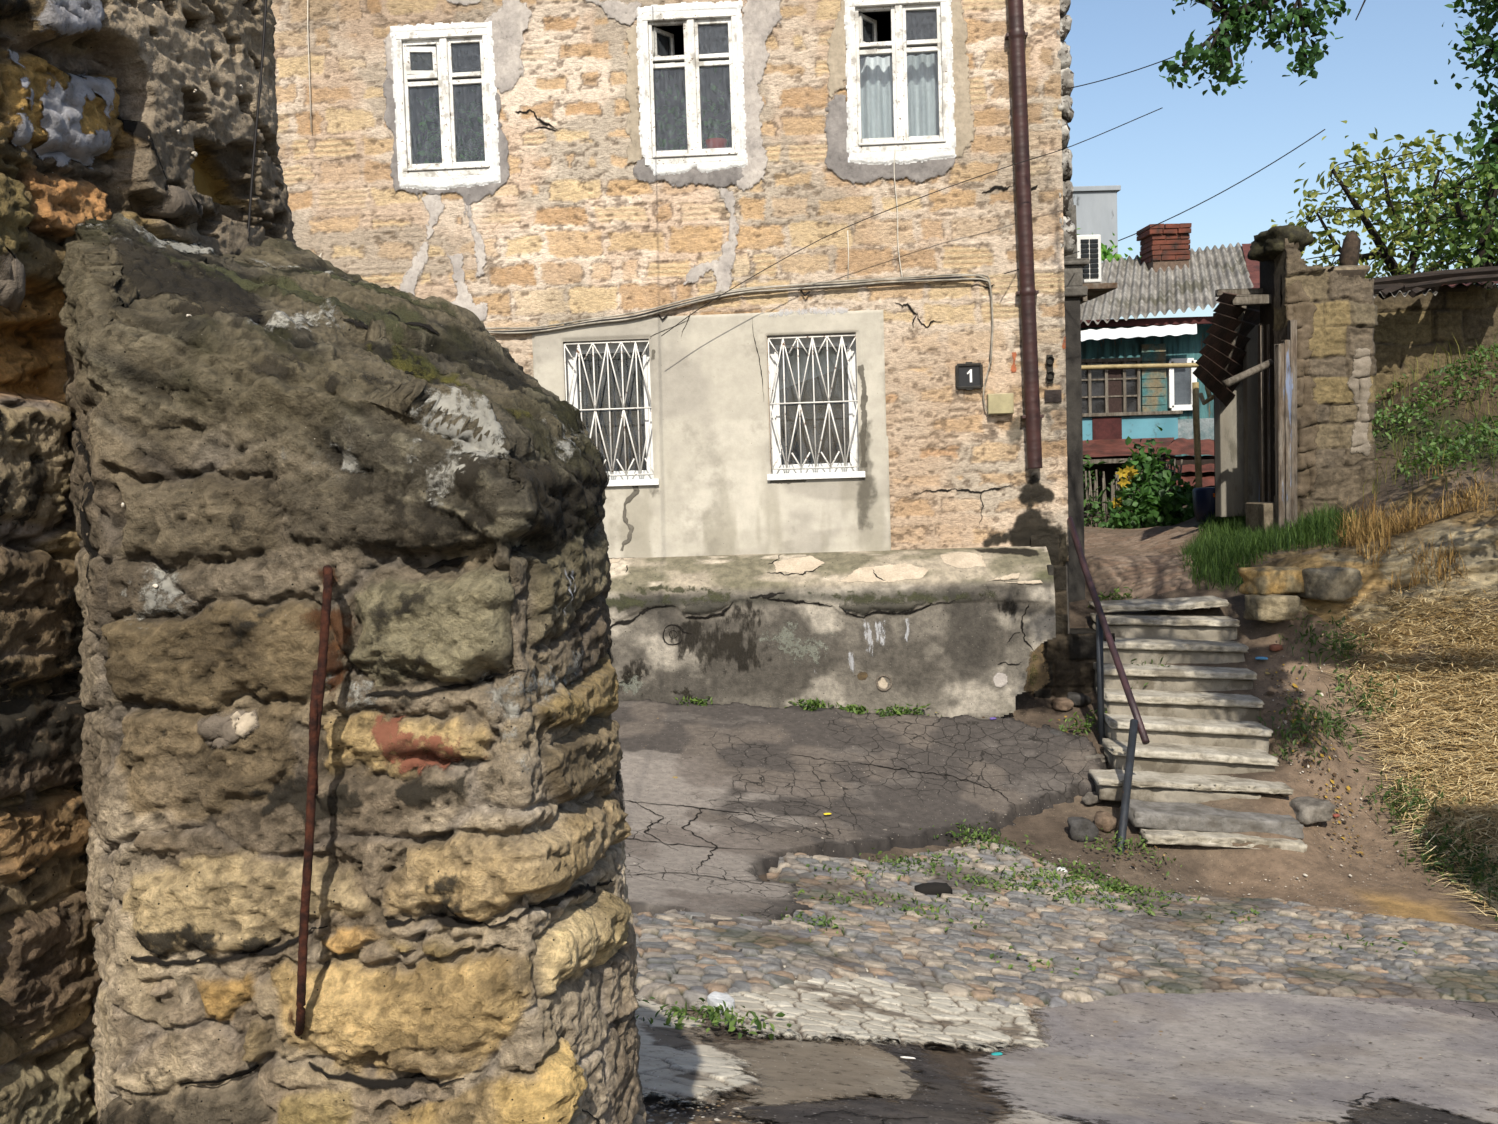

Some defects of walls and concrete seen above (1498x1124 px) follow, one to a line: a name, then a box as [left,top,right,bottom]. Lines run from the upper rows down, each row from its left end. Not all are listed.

flaking render [37,0,105,36]
peeling [9,50,116,169]
leakage [858,423,873,526]
crack [609,486,639,572]
leakage [975,474,1069,562]
leakage [670,600,828,671]
crack [610,554,955,645]
leakage [982,595,1016,615]
crack [1000,605,1034,665]
crack [793,754,1015,805]